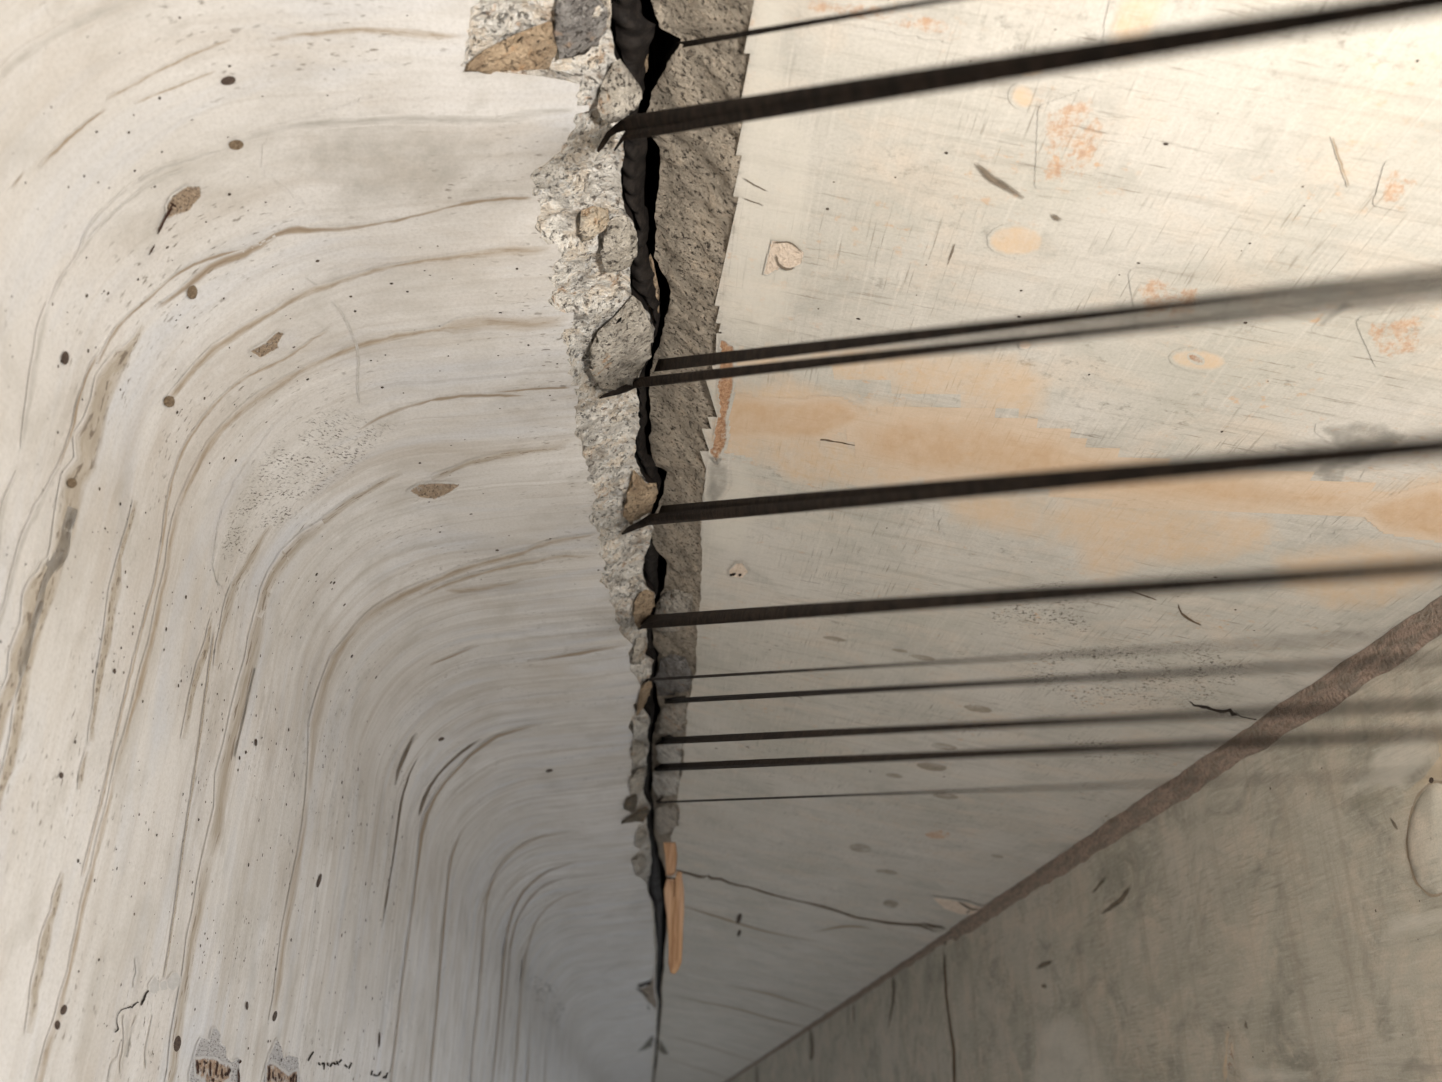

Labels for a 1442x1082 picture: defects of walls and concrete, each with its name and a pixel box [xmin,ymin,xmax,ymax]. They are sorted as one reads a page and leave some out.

damp [742,0,803,97]
damp [1008,76,1041,110]
spalling [763,240,805,276]
damp [700,112,1171,500]
rust [708,337,739,466]
damp [1275,418,1413,450]
spalling [460,0,754,1082]
damp [701,515,766,560]
crack [597,0,1442,1082]
damp [929,457,1442,621]
spalling [188,1026,241,1082]
spalling [261,1038,302,1082]